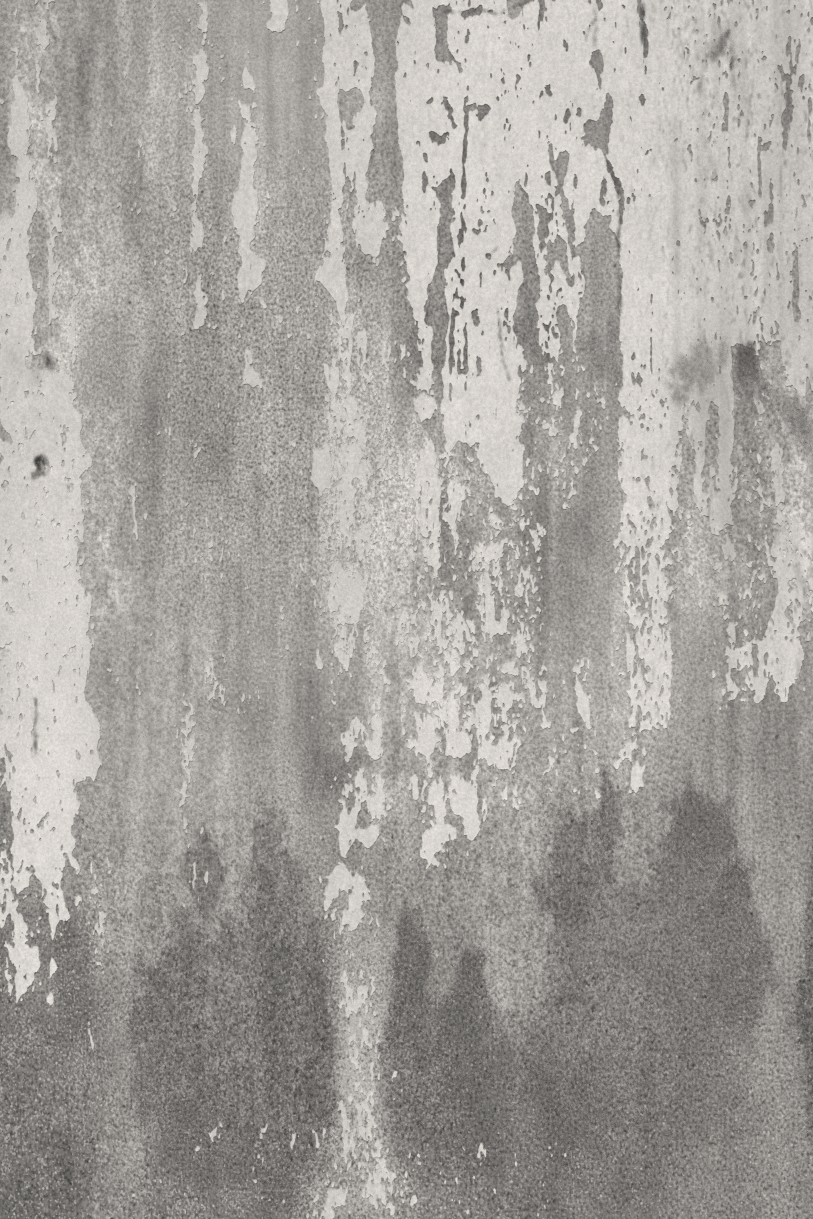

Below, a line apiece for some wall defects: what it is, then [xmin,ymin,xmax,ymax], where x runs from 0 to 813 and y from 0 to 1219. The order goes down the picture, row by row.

peeling [34,0,55,50]
peeling [0,46,118,1005]
peeling [105,462,160,540]
peeling [180,502,251,589]
peeling [263,0,813,1219]
peeling [193,1123,224,1158]
damp [133,819,340,1157]
damp [382,917,509,1155]
damp [533,781,770,1101]